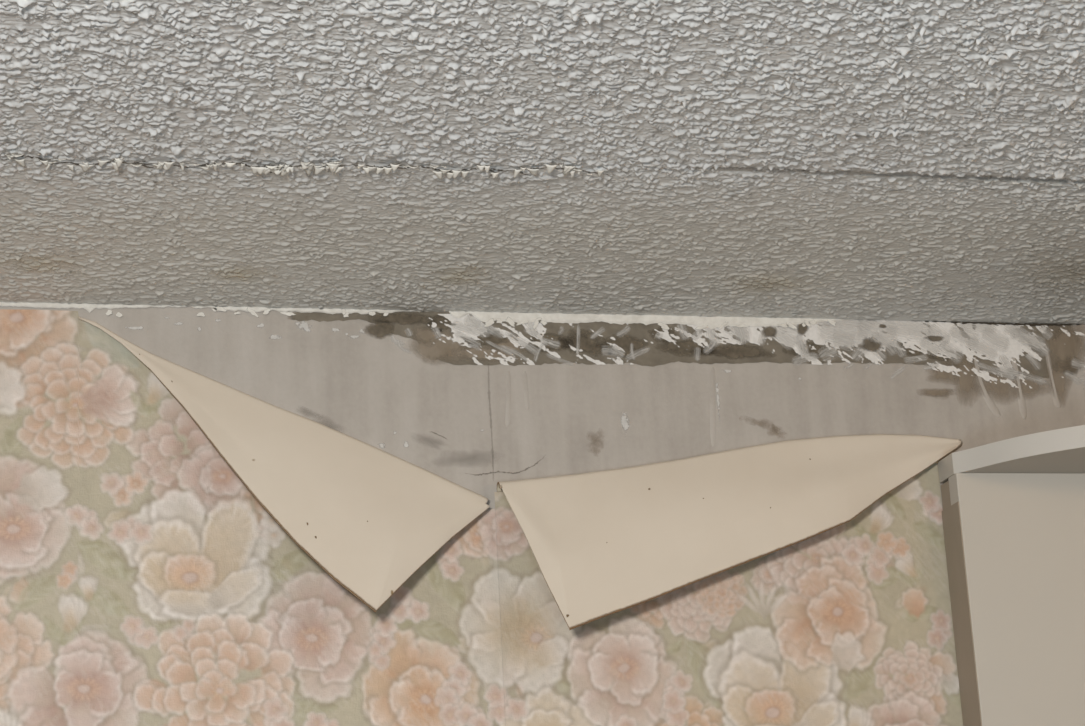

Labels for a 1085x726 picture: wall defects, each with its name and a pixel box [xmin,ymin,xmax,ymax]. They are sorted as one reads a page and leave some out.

crack [1,154,616,179]
flaking render [0,302,1085,388]